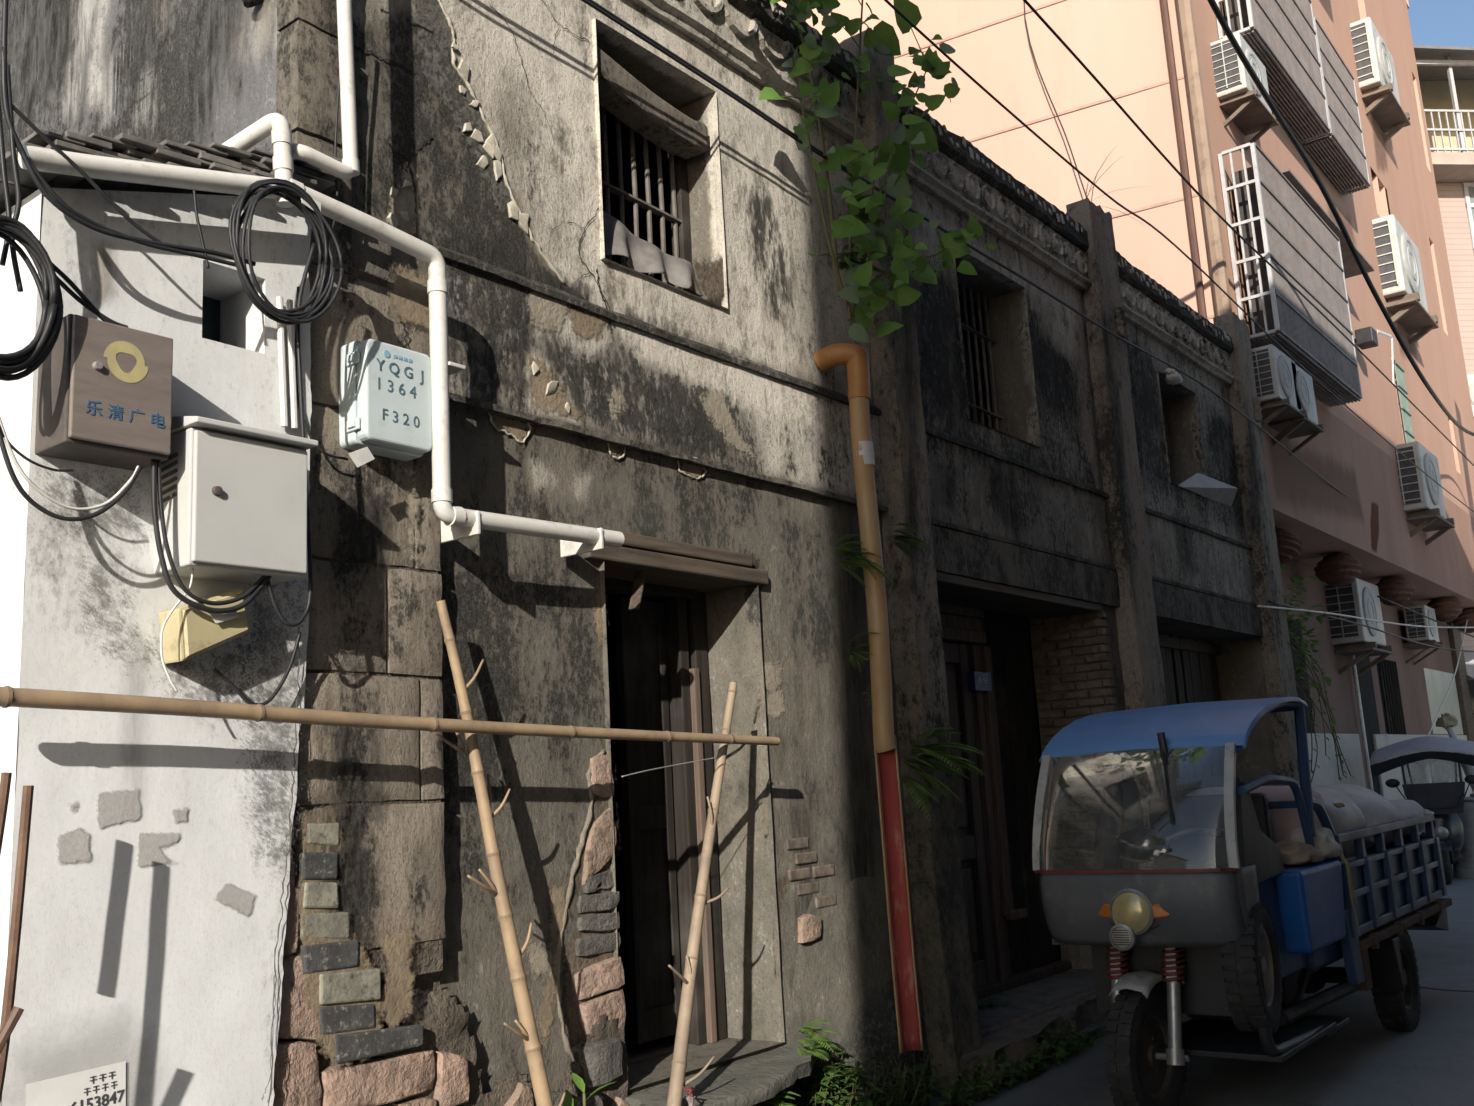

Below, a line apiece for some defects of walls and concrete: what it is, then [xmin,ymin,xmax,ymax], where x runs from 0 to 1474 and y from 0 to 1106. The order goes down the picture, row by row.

water stain [12,0,93,105]
crack [488,0,602,136]
peeling [386,162,422,236]
peeling [413,0,607,340]
peeling [388,264,429,330]
water stain [692,254,730,302]
water stain [449,301,726,459]
water stain [903,275,1095,548]
water stain [44,470,306,872]
peeling [57,788,188,867]
peeling [216,883,256,916]
flaking render [295,799,424,1069]